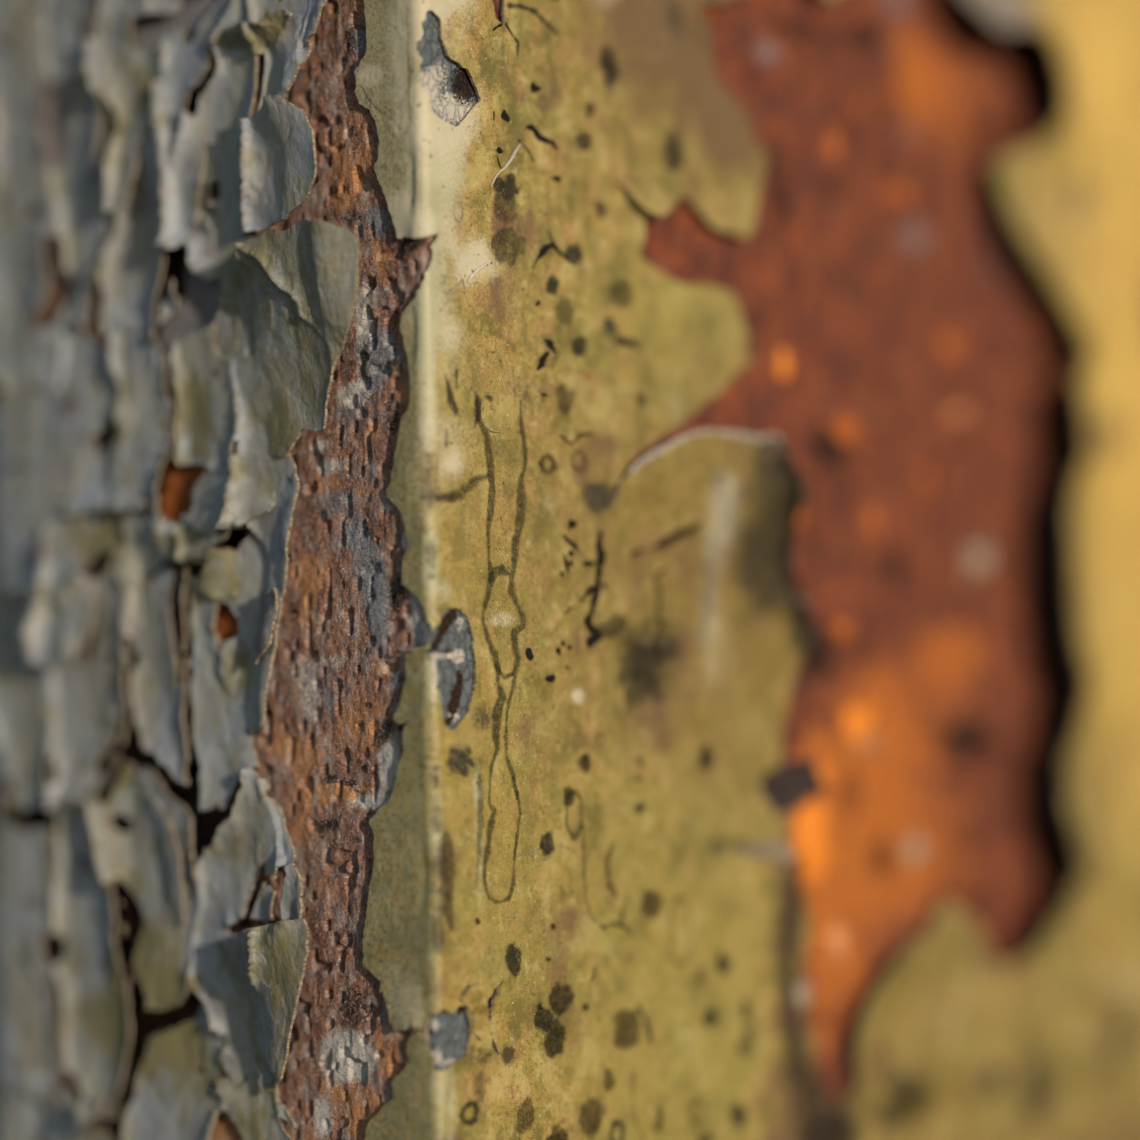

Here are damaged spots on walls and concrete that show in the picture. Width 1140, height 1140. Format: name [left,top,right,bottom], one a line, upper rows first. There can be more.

peeling [417,11,478,126]
peeling [58,34,277,694]
peeling [12,530,96,669]
crack [96,636,175,800]
crack [160,541,226,707]
corrosion [215,0,435,1140]
peeling [419,608,474,729]
water stain [475,395,556,903]
corrosion [612,0,1072,1110]
crack [116,876,147,1014]
water stain [505,944,521,977]
water stain [534,985,589,1058]